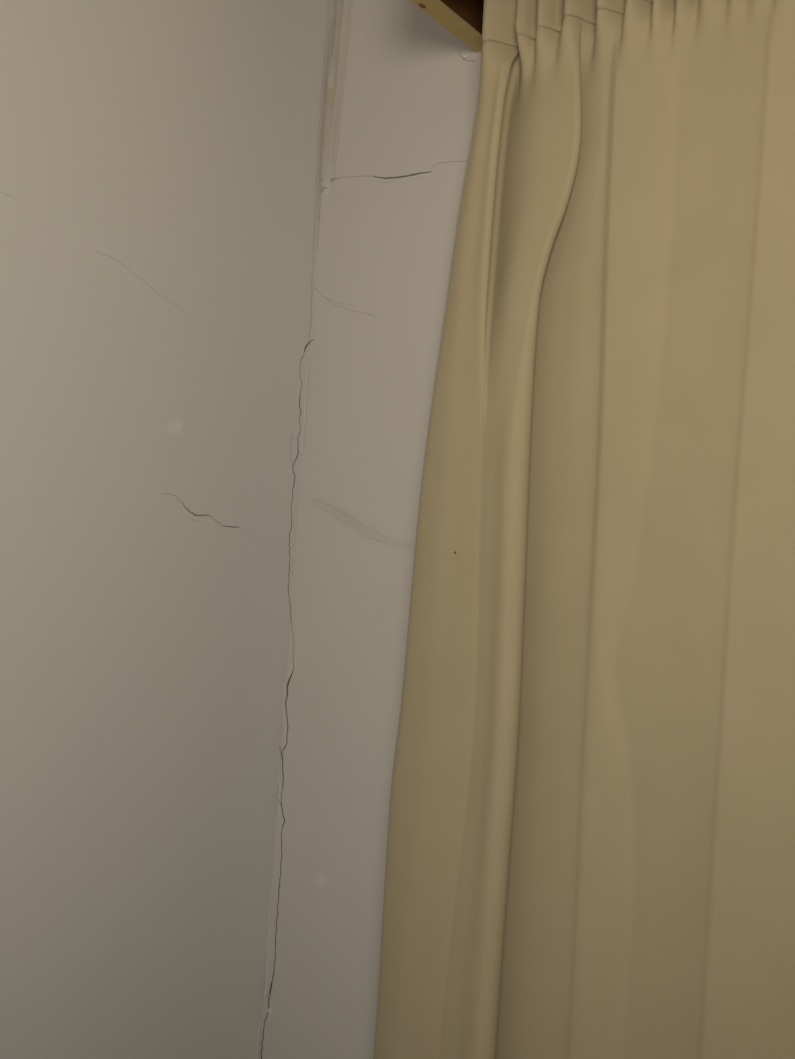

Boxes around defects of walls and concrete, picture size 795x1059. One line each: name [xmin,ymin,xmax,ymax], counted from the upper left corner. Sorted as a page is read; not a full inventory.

crack [321,161,464,198]
crack [162,493,238,528]
crack [256,230,381,1059]